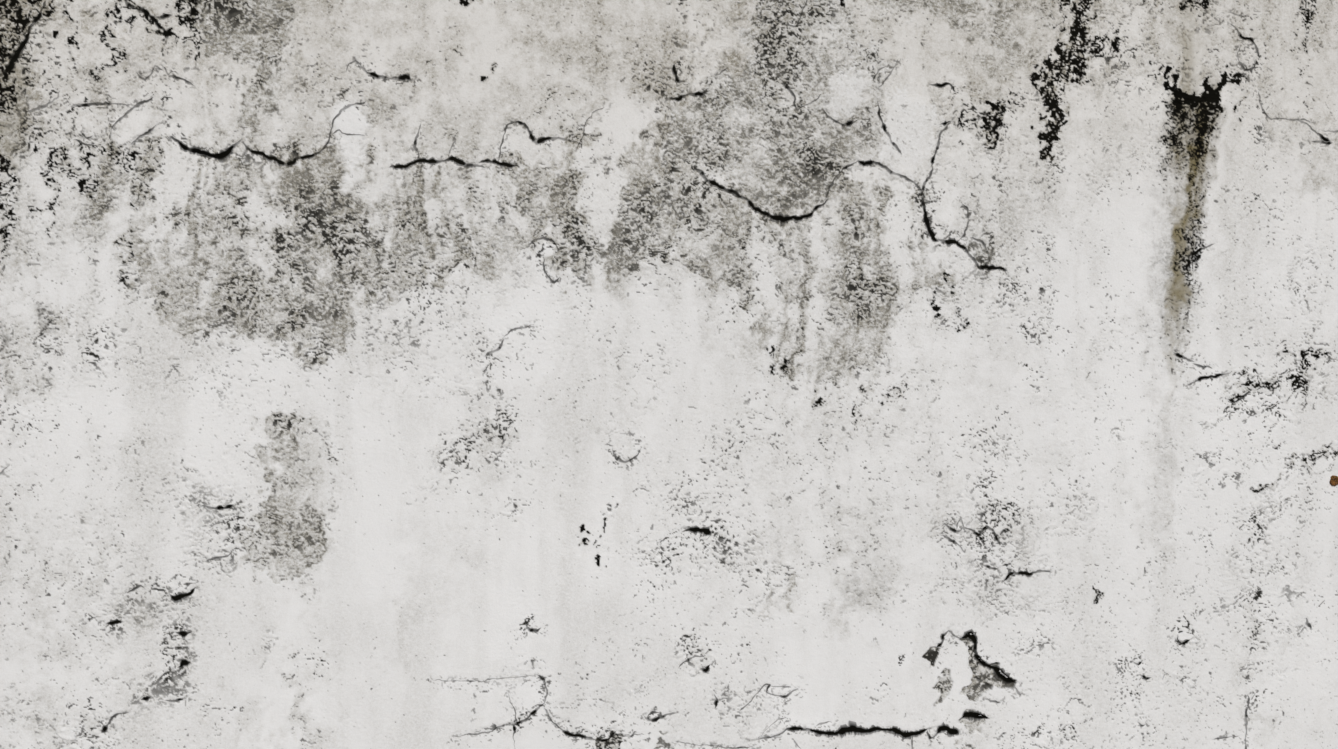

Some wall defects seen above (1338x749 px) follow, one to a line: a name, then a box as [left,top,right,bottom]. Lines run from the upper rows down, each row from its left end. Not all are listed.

leakage [0,133,148,264]
leakage [0,0,205,116]
leakage [114,201,144,286]
crack [25,60,414,167]
crack [390,107,604,170]
crack [776,0,807,27]
crack [694,60,1008,271]
leakage [838,0,1122,167]
leakage [765,344,804,376]
leakage [1136,59,1249,592]
crack [437,674,959,749]
flaking render [921,629,1023,749]